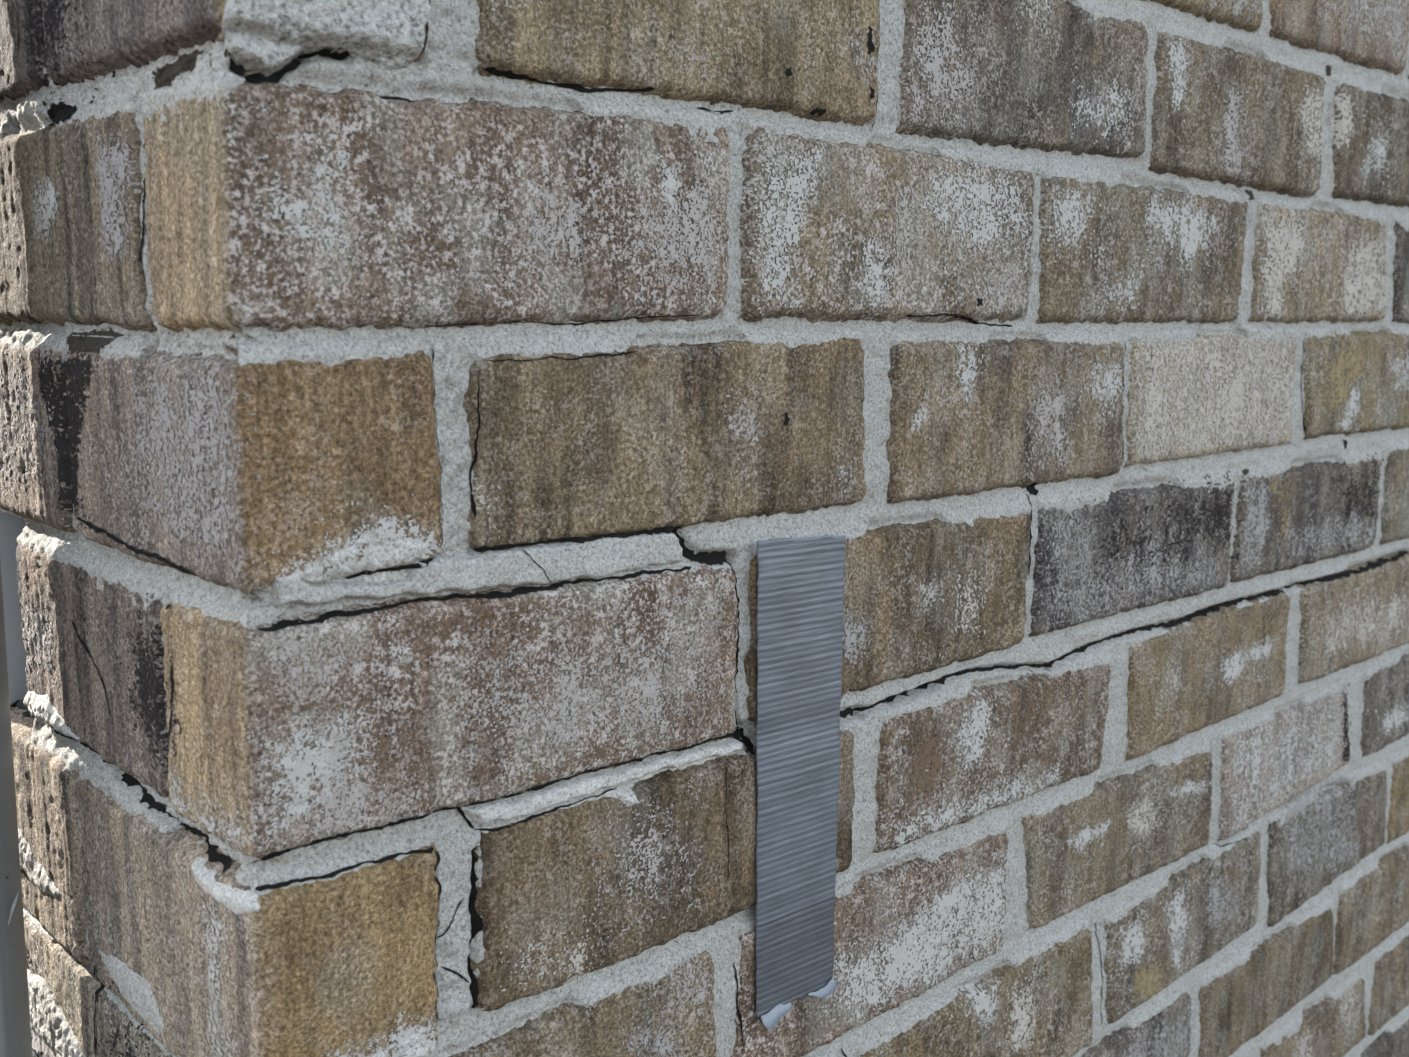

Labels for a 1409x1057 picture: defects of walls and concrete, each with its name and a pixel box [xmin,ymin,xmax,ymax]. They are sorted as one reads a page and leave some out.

crack [48,315,755,1022]
crack [840,551,1409,718]